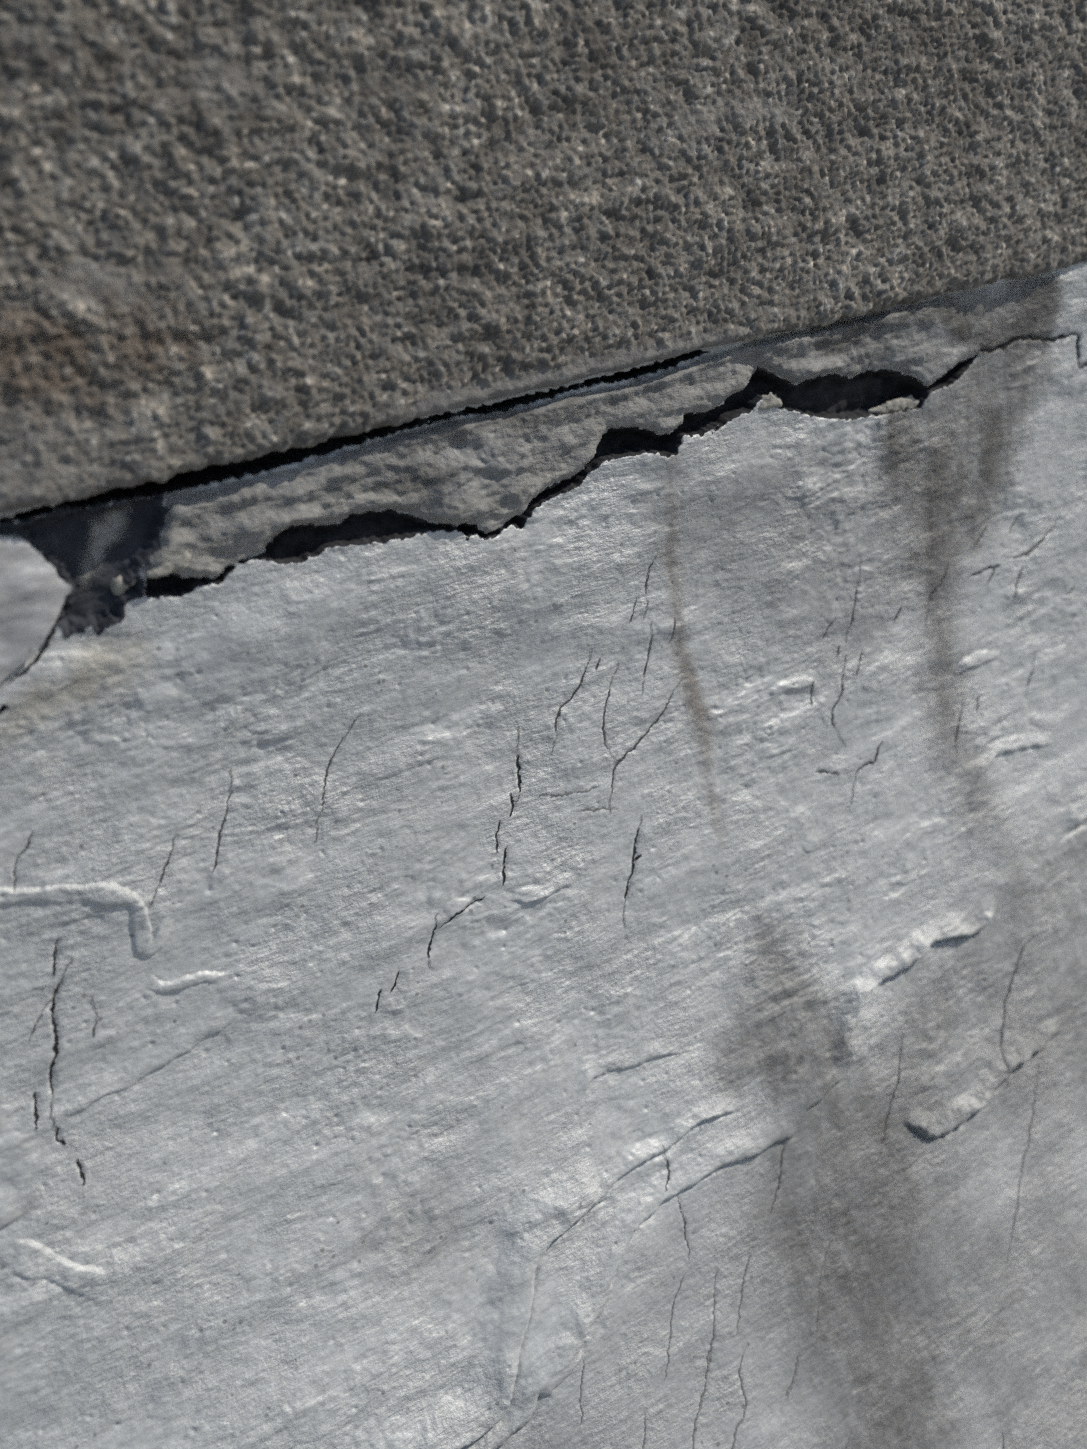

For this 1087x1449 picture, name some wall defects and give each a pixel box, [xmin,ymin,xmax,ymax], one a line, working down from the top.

crack [14,832,33,893]
crack [0,605,65,713]
crack [149,835,178,908]
crack [212,768,234,874]
crack [316,715,360,841]
spalling [0,296,978,638]
crack [375,549,683,1013]
crack [811,561,883,801]
crack [895,514,1056,627]
crack [29,939,98,1185]
crack [1000,932,1041,1263]
crack [663,1145,752,1449]